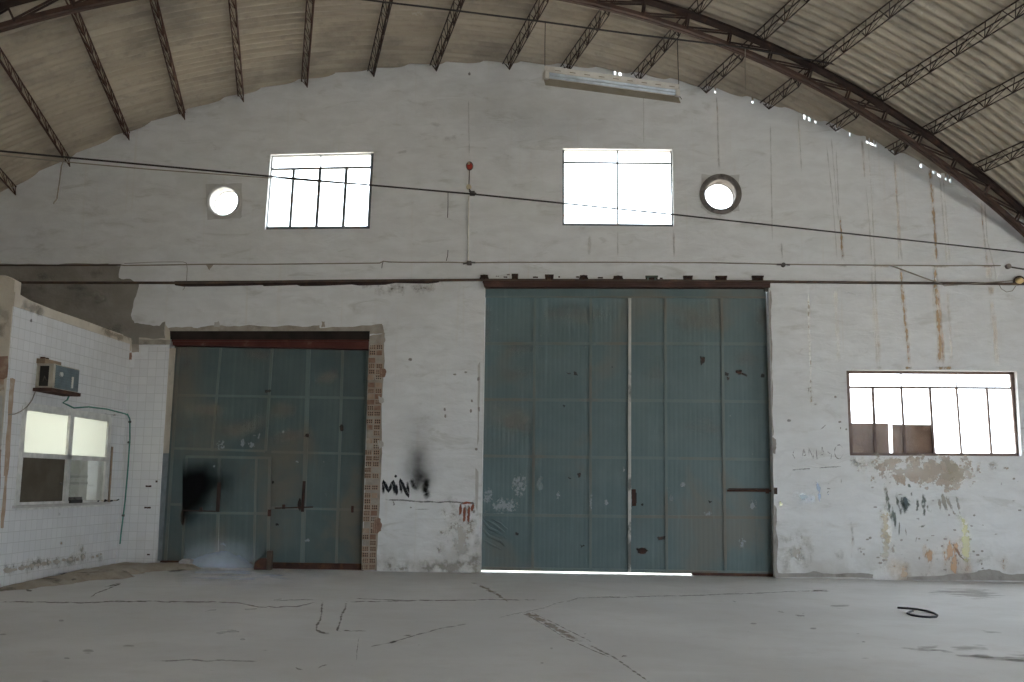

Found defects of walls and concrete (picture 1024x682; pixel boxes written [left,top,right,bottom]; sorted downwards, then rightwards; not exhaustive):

corrosion [934,272,950,369]
flaking render [0,263,386,573]
peeling [871,455,966,493]